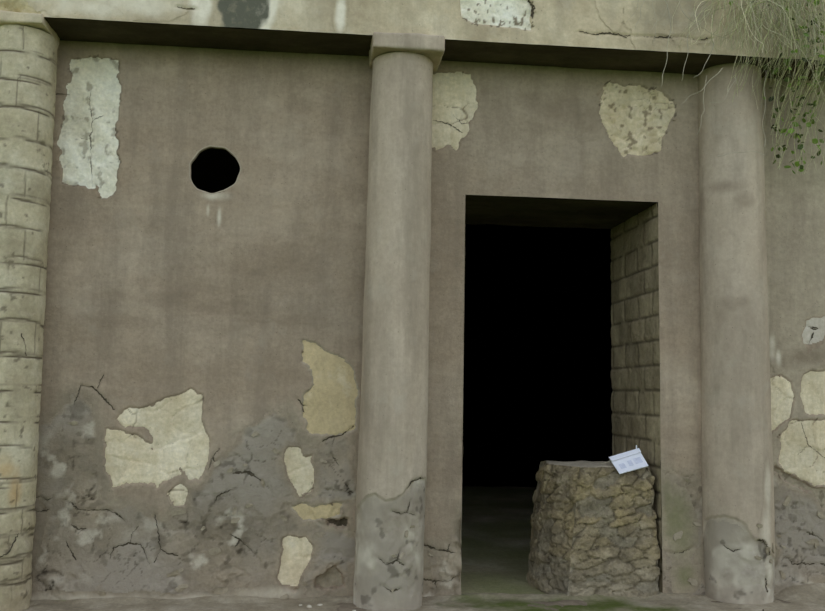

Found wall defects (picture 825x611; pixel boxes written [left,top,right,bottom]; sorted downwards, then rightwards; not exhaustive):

spalling [0,0,41,14]
peeling [460,0,536,30]
crack [579,31,708,40]
peeling [57,57,121,198]
peeling [432,72,479,152]
peeling [597,82,677,157]
peeling [802,316,825,344]
spalling [32,340,459,611]
spalling [662,371,825,604]